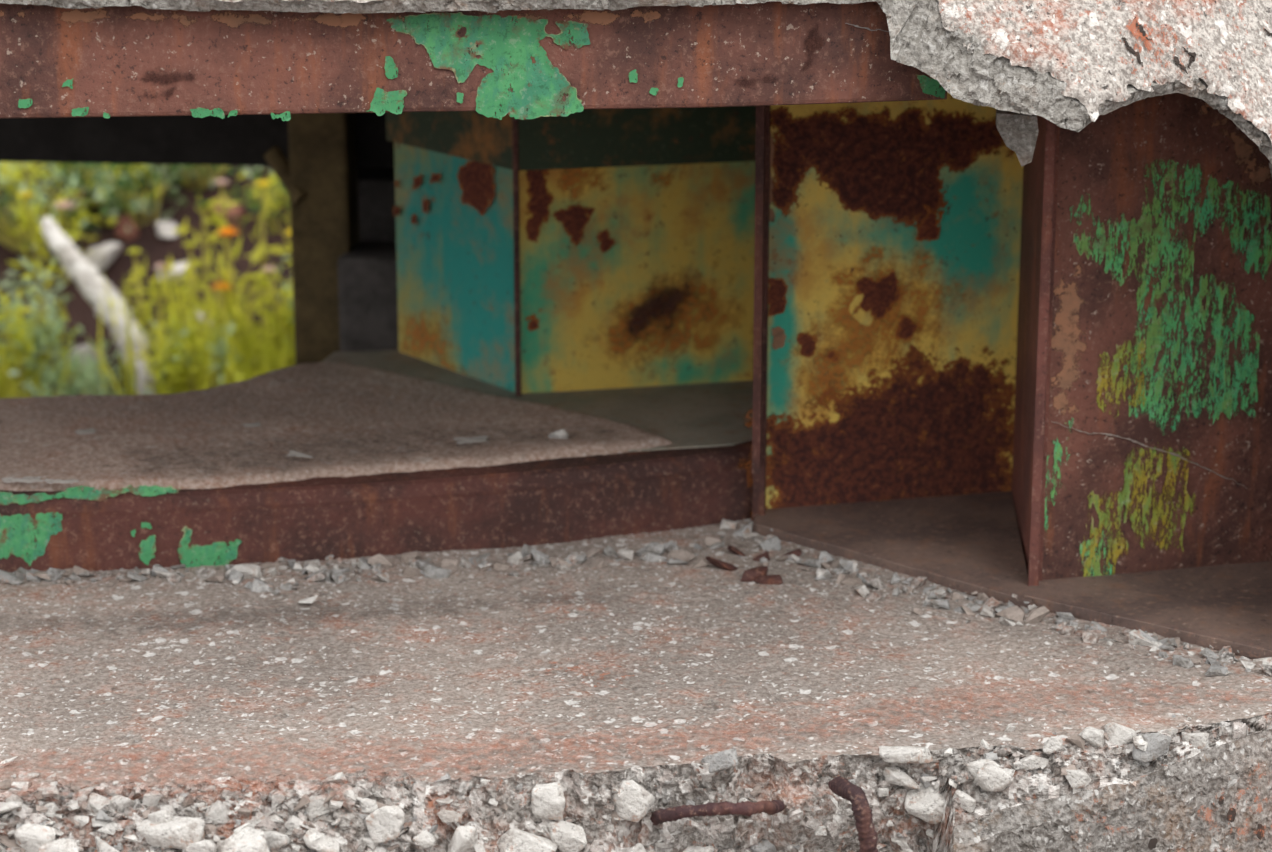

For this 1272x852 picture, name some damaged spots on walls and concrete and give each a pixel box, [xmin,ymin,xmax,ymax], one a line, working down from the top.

rust [292,13,368,28]
rust [563,9,661,25]
spalling [0,0,1272,176]
rust [457,160,496,216]
rust [525,167,618,253]
rust [609,271,733,361]
rust [738,106,1016,509]
peeling [1068,158,1272,577]
peeling [1044,418,1074,530]
peeling [0,485,180,566]
peeling [178,526,242,567]
spalling [0,712,1272,852]